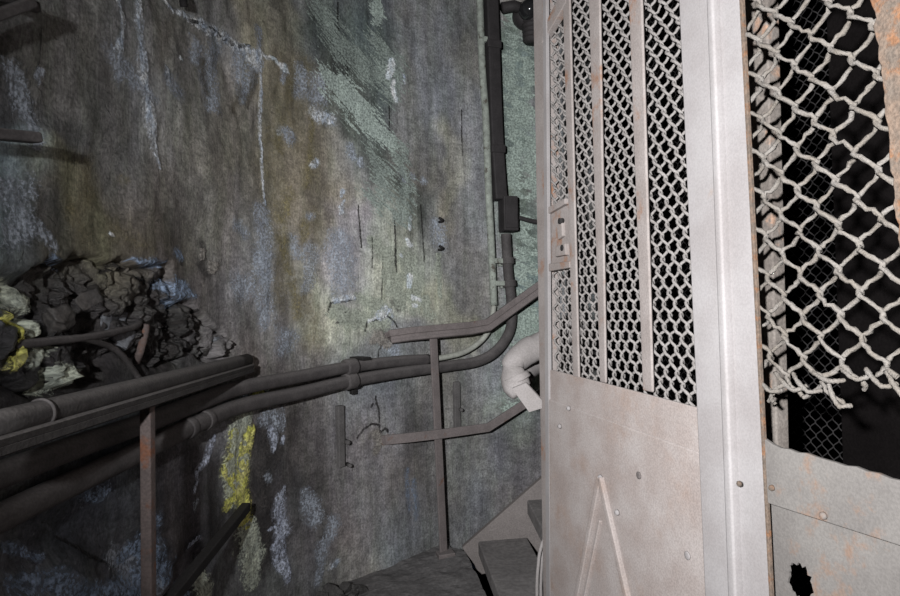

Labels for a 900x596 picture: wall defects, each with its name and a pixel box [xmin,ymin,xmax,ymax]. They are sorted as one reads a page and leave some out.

damp [110,0,161,170]
crack [164,0,290,112]
damp [295,65,336,125]
damp [386,57,405,102]
damp [407,273,421,308]
crack [357,396,389,455]